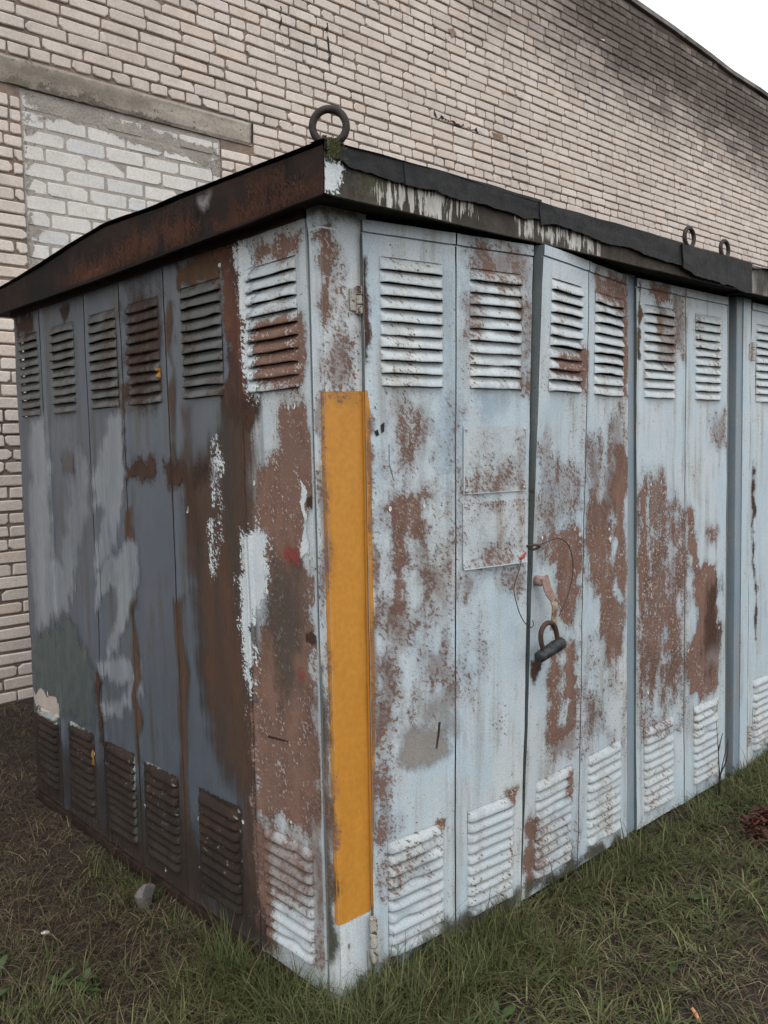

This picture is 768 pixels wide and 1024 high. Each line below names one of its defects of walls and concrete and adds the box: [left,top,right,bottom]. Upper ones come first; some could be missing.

peeling [374,180,473,222]
peeling [514,214,600,256]
rust [34,222,372,973]
peeling [206,434,225,581]
peeling [233,511,273,696]
rust [367,266,723,903]
rust [751,469,759,634]
peeling [33,688,60,718]